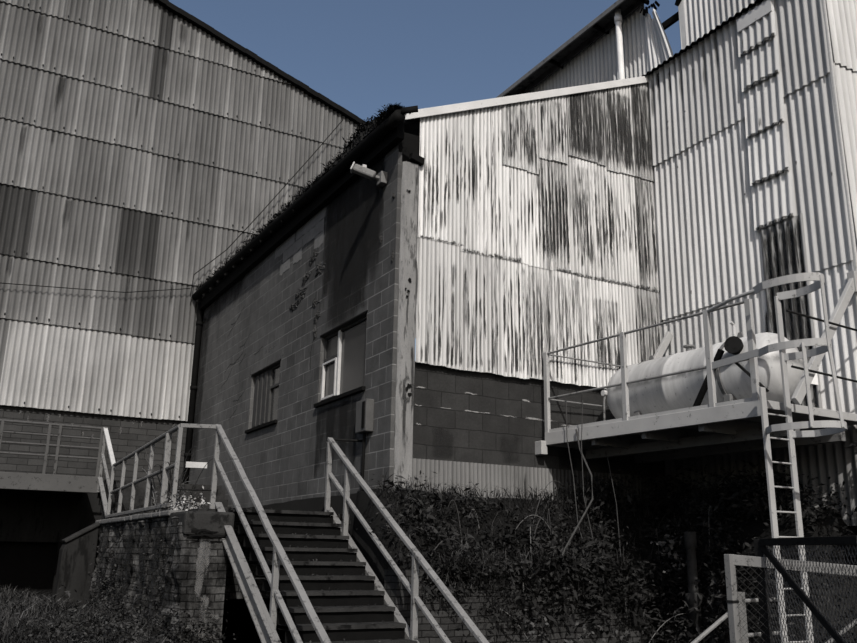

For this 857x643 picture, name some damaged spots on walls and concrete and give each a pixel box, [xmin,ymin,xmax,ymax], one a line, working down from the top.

water stain [323,157,384,324]